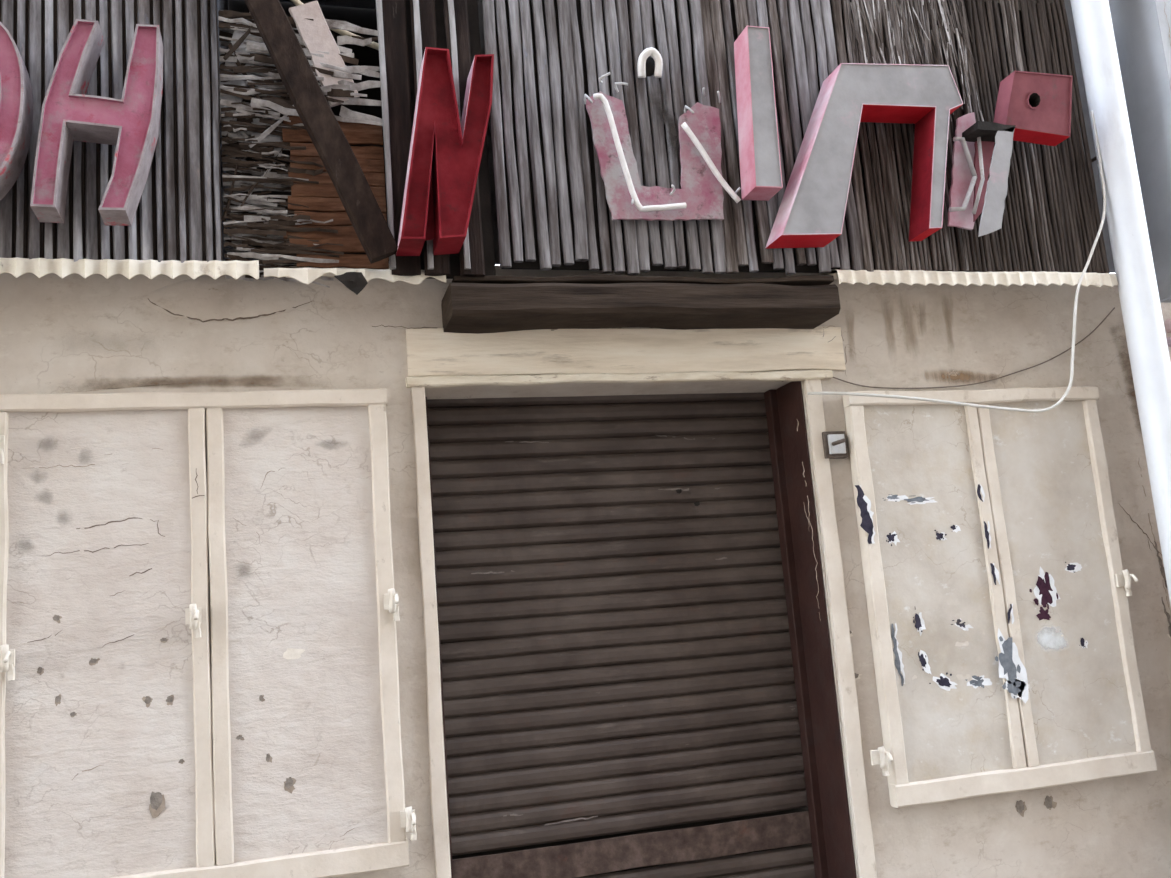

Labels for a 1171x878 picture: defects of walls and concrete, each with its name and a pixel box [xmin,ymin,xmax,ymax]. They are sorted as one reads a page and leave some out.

damp [935,372,993,382]
peeling [855,485,937,546]
peeling [934,525,961,540]
peeling [990,563,1000,585]
peeling [1065,562,1082,573]
peeling [1029,567,1060,621]
peeling [913,608,926,636]
peeling [891,623,905,686]
peeling [918,604,1029,704]